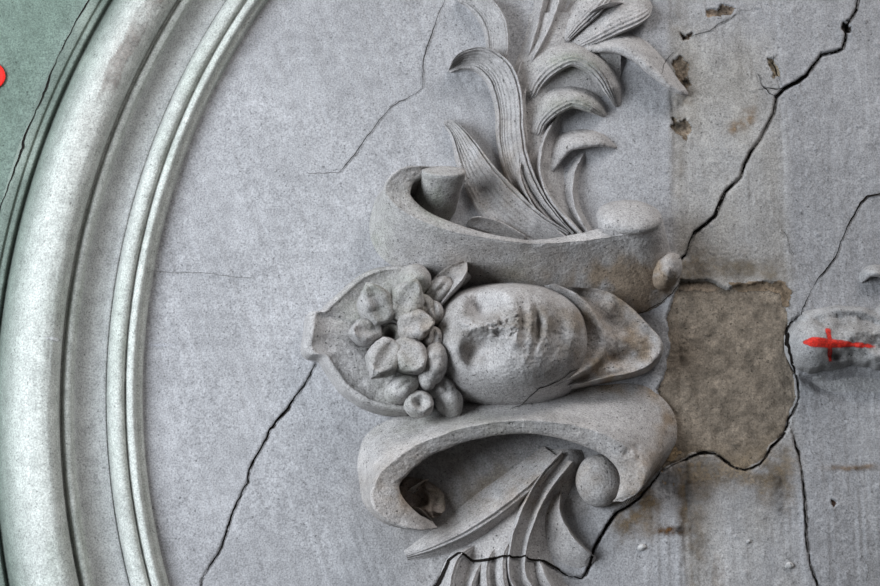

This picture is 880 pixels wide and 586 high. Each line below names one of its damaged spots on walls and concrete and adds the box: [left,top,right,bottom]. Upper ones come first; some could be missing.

crack [309,1,445,174]
spalling [670,117,692,141]
spalling [672,56,691,89]
spalling [706,4,735,17]
crack [681,0,858,260]
spalling [767,58,780,78]
crack [201,365,315,585]
crack [435,193,880,586]